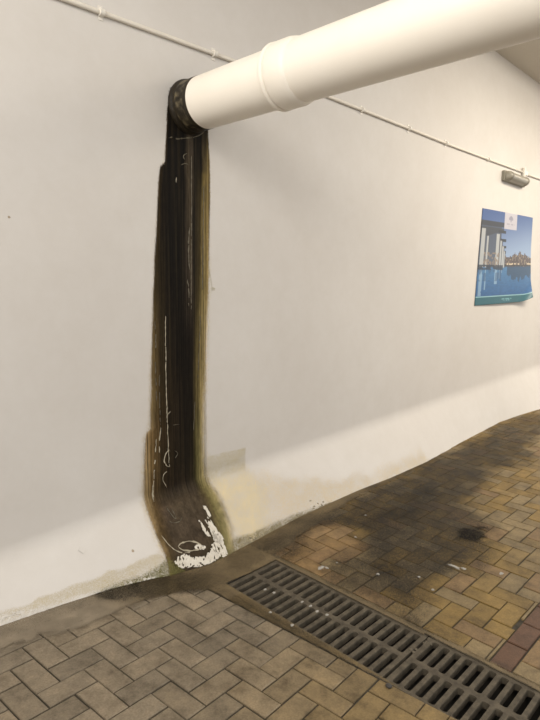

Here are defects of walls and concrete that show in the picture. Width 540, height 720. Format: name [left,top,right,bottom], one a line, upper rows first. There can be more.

damp [0,87,540,663]